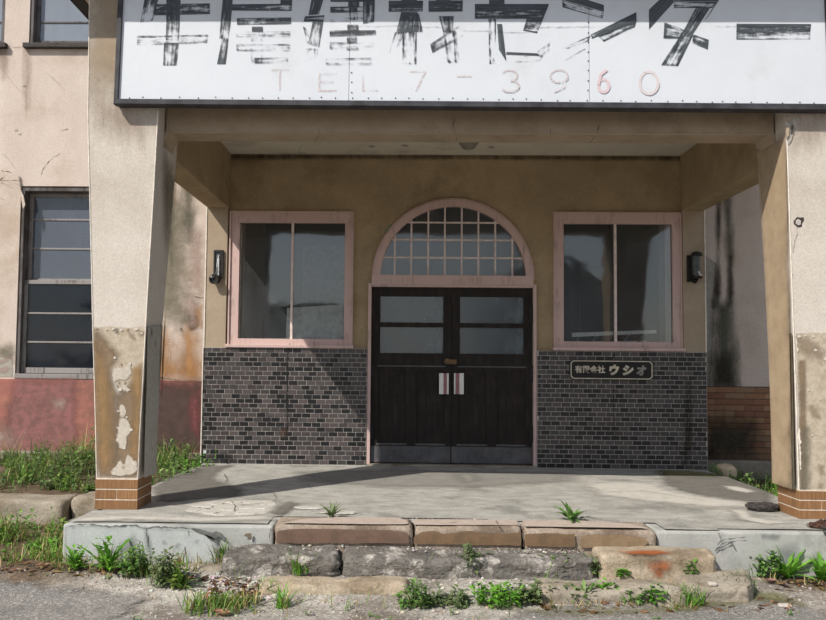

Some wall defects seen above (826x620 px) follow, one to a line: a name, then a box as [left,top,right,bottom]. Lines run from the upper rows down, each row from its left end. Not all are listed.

peeling [93,325,163,478]
damp [157,323,202,452]
damp [164,162,199,324]
damp [301,470,569,486]
rust [625,550,669,576]
damp [585,470,790,524]
damp [706,198,734,387]
damp [757,139,808,489]